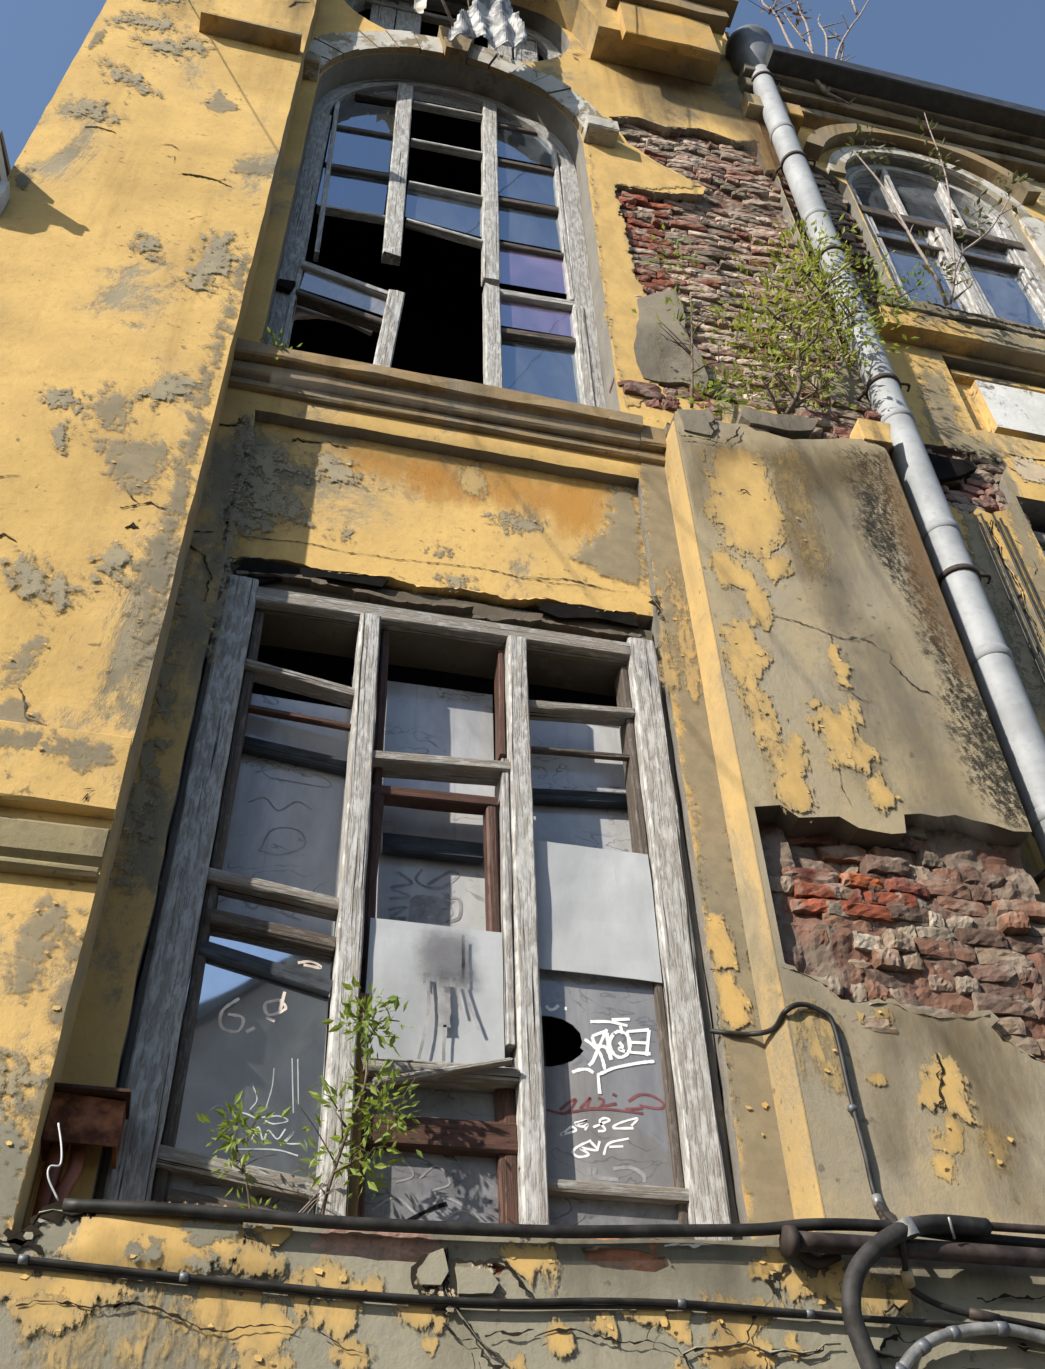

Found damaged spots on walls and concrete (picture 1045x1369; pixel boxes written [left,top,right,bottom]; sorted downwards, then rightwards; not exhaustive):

flaking render [609,116,857,414]
spalling [231,540,642,642]
crack [774,616,934,702]
water stain [839,447,1027,827]
spalling [916,366,1045,706]
peeling [567,462,794,1239]
flaking render [757,822,1045,1063]
crack [16,1300,363,1353]
flaking render [310,1229,442,1275]
crack [410,1245,841,1369]
crack [875,1303,915,1359]
crack [977,1293,1045,1303]